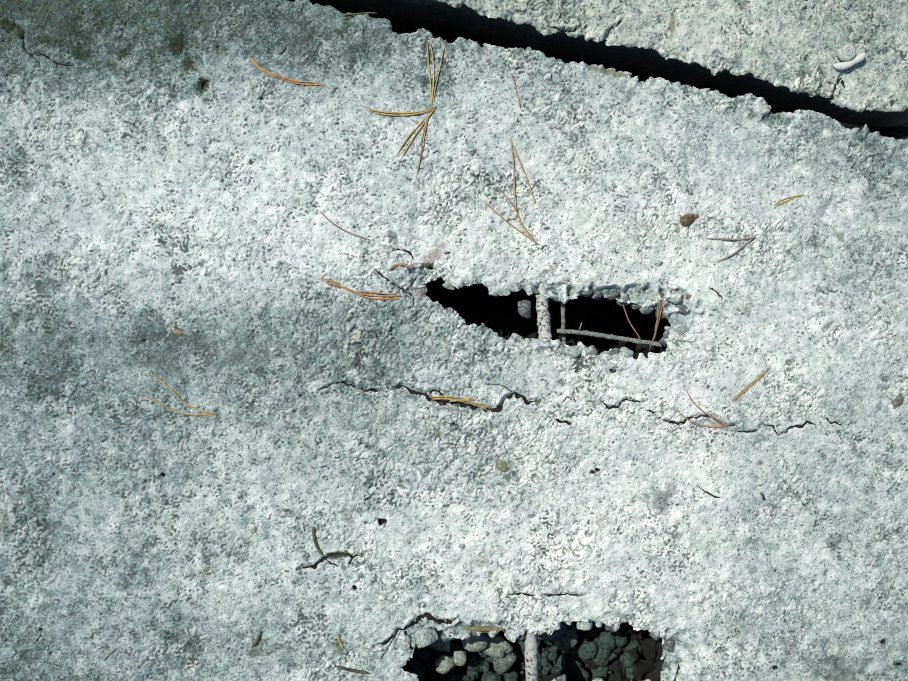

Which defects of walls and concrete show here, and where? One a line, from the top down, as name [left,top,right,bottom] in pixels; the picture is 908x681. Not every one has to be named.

crack [550,25,581,33]
crack [827,77,845,102]
spalling [426,277,692,360]
crack [320,381,537,413]
crack [554,396,573,425]
crack [602,398,841,435]
crack [302,552,364,569]
spalling [401,626,494,681]
spalling [511,660,526,679]
spalling [538,621,675,681]